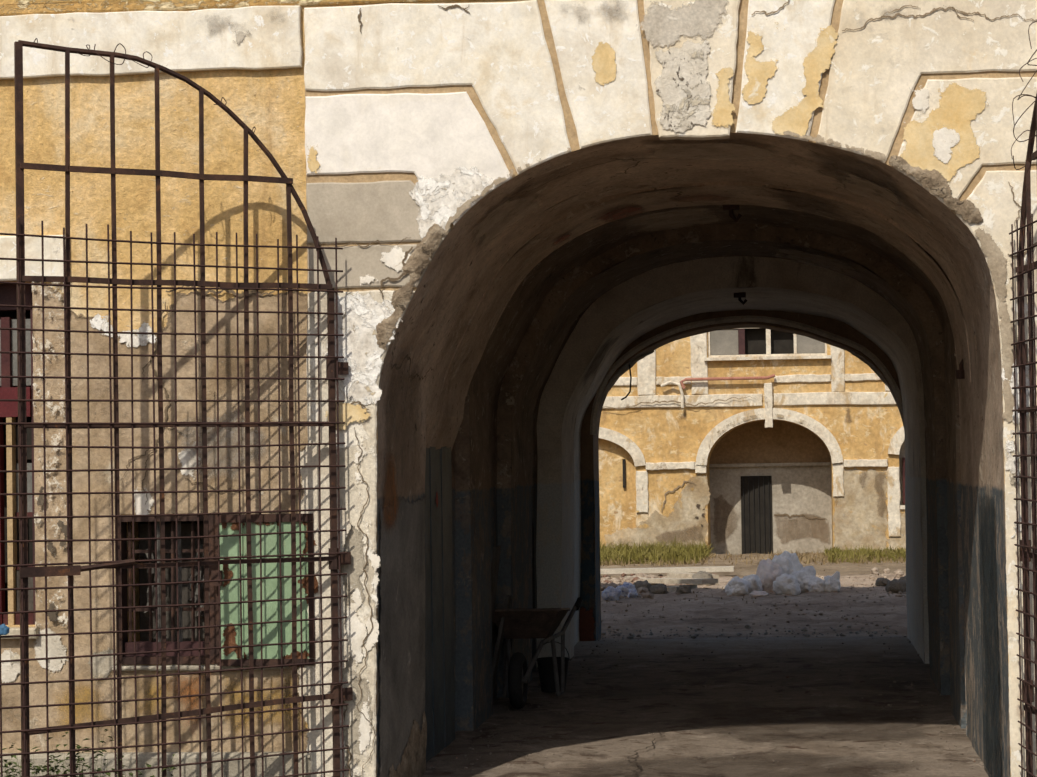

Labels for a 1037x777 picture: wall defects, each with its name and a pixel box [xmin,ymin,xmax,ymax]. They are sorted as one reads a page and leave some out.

crack [842,5,1036,31]
peeling [592,42,617,87]
flaking render [636,0,779,133]
peeling [772,25,887,161]
peeling [900,82,989,182]
peeling [409,158,541,240]
peeling [380,246,410,274]
peeling [1,275,403,777]
flaking render [389,711,427,777]